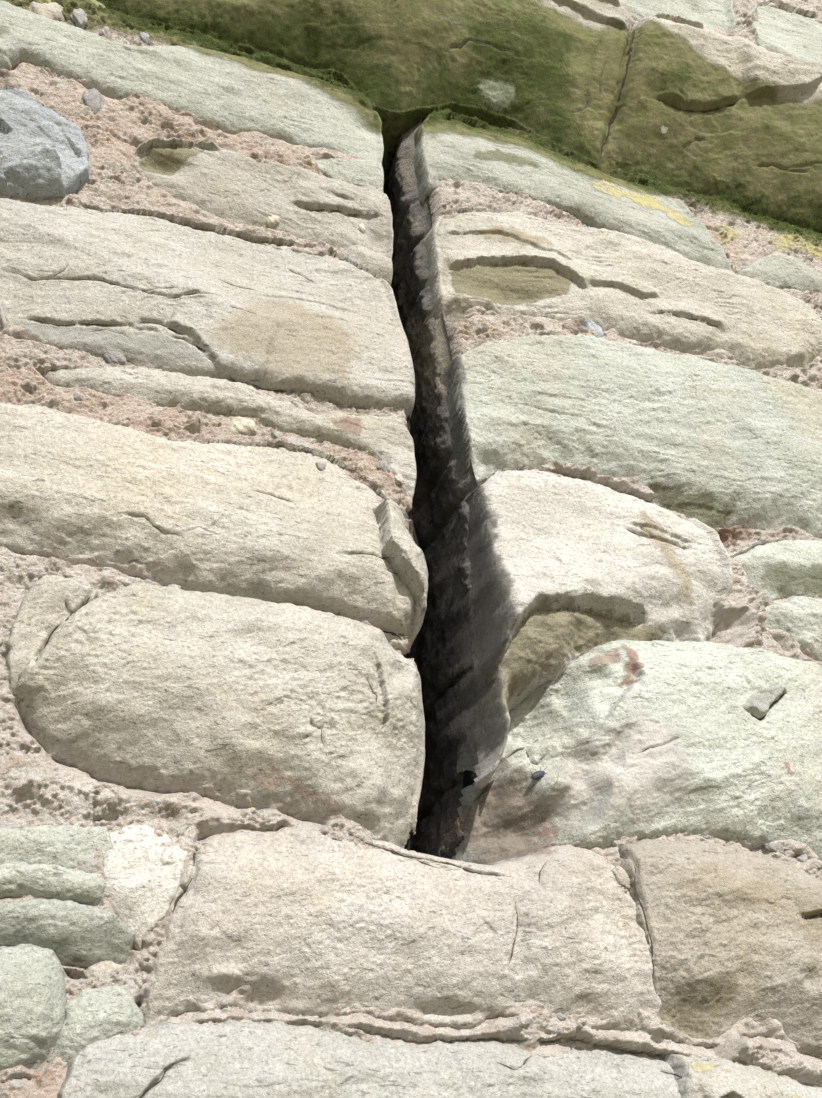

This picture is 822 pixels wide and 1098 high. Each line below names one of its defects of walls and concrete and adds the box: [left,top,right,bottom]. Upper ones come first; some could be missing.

crack [570,31,635,164]